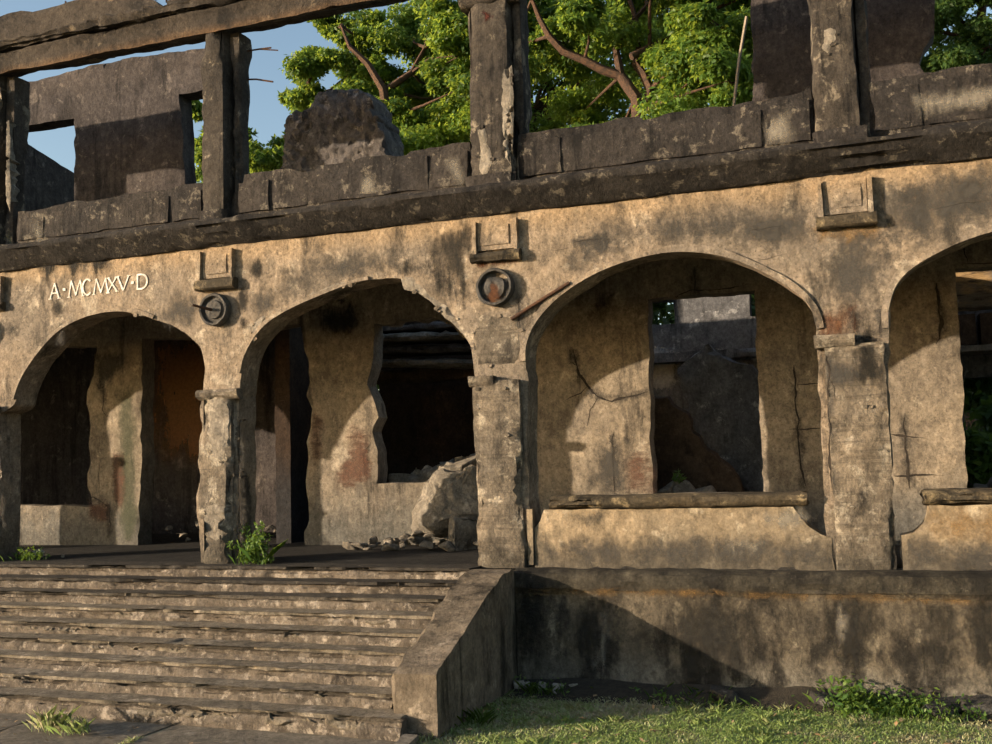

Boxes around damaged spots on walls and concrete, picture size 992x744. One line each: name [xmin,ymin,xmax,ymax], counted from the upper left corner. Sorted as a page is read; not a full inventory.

flaking render [477,65,514,174]
water stain [238,255,420,328]
water stain [318,304,359,333]
water stain [433,226,471,309]
crack [935,283,946,343]
crack [567,349,648,425]
crack [609,433,617,491]
crack [789,356,836,490]
crack [891,417,944,489]
water stain [658,591,754,683]
water stain [835,596,872,679]